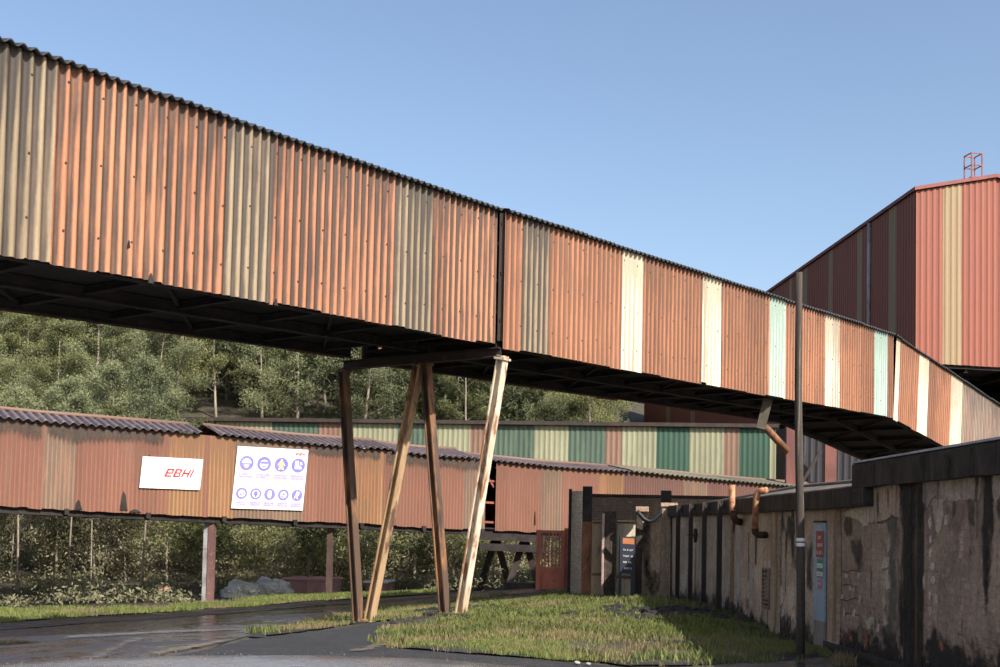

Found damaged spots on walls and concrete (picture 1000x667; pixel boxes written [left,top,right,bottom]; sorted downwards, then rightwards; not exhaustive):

peeling [841,537,891,649]
leakage [839,451,1000,667]
peeling [922,475,1000,619]